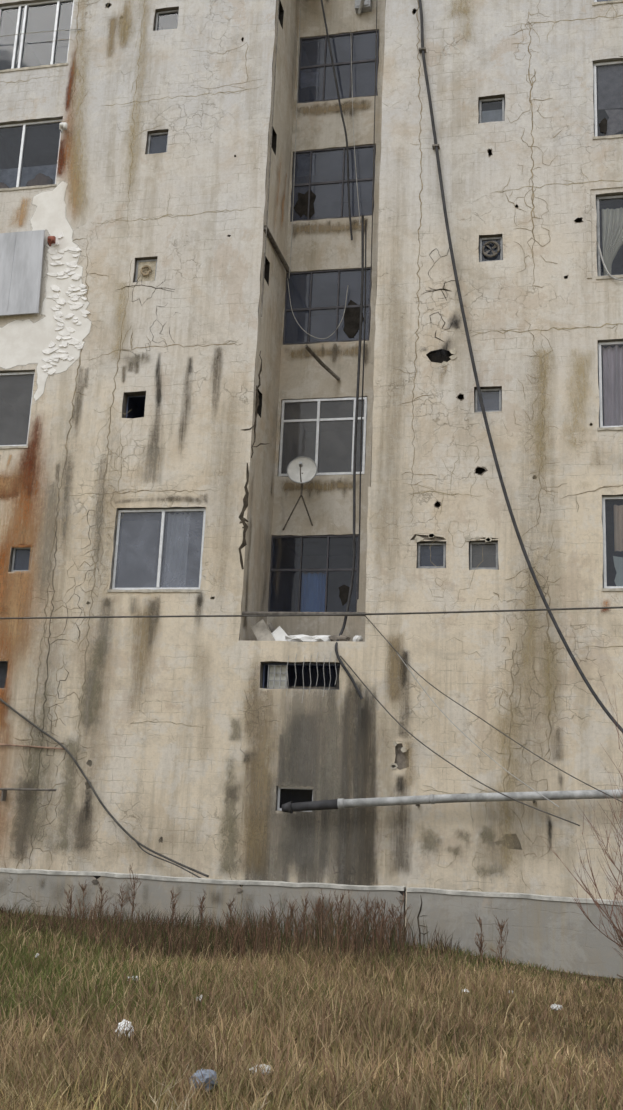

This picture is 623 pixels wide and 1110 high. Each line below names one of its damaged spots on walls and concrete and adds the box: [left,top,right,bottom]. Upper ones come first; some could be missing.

rust [57,60,79,211]
peeling [0,181,91,401]
crack [1,0,270,870]
water stain [122,354,161,480]
water stain [180,359,191,441]
water stain [213,353,221,393]
crack [398,0,623,944]
rust [0,421,40,727]
water stain [82,599,110,727]
water stain [14,713,45,857]
water stain [56,741,90,849]
water stain [229,686,376,908]